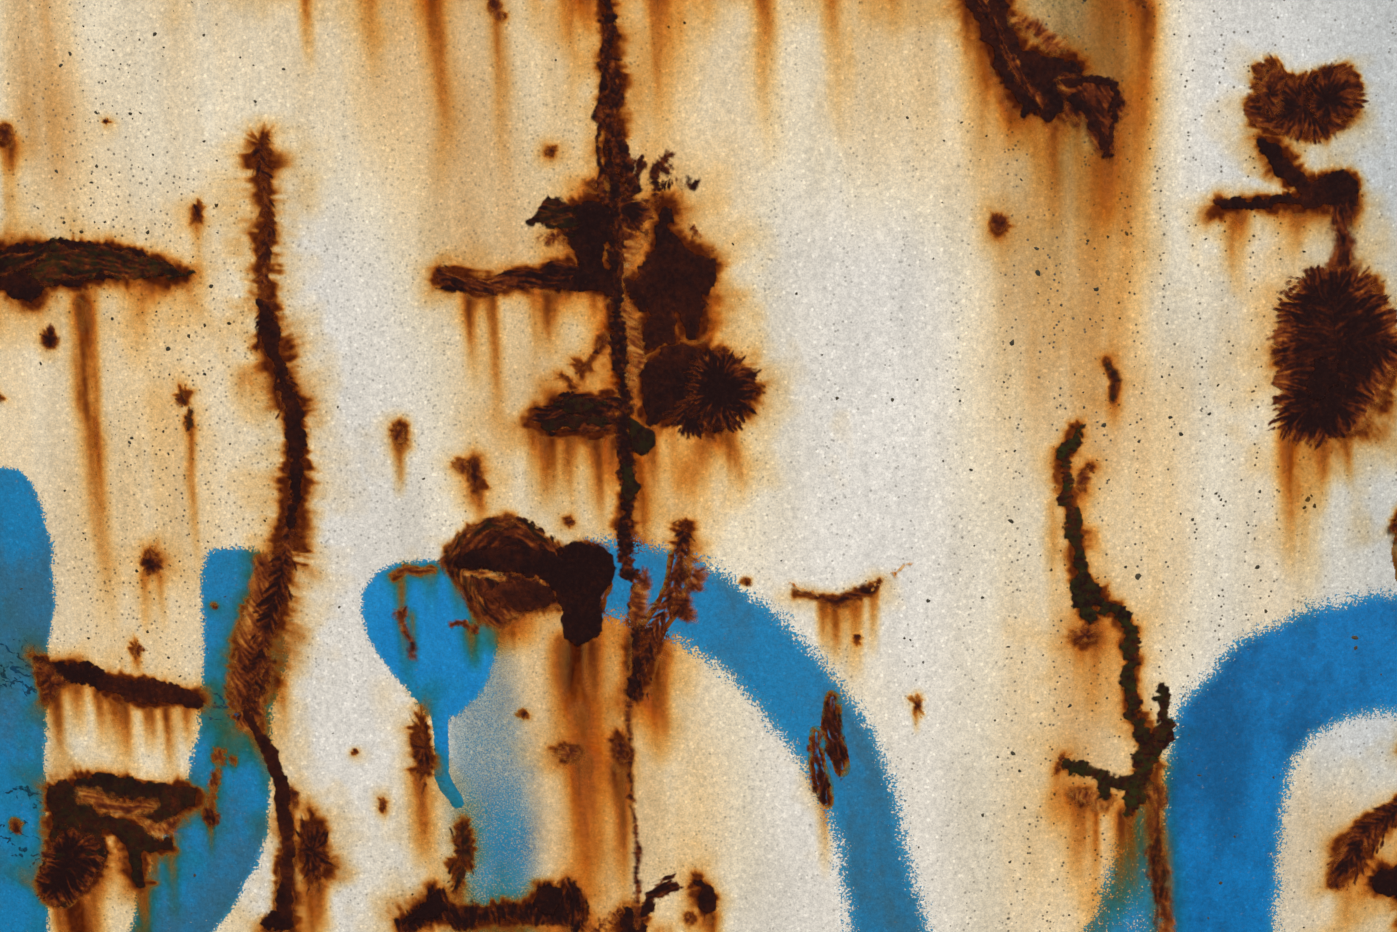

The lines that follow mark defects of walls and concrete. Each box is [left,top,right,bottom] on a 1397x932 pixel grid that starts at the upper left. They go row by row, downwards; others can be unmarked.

rust [956,0,1126,158]
rust [0,236,196,465]
rust [190,199,204,224]
rust [429,150,766,489]
rust [1204,55,1397,492]
rust [451,454,489,502]
rust [27,553,275,739]
rust [389,512,616,807]
rust [34,747,237,932]
rust [261,787,339,932]
rust [393,816,719,932]
rust [1326,794,1397,927]